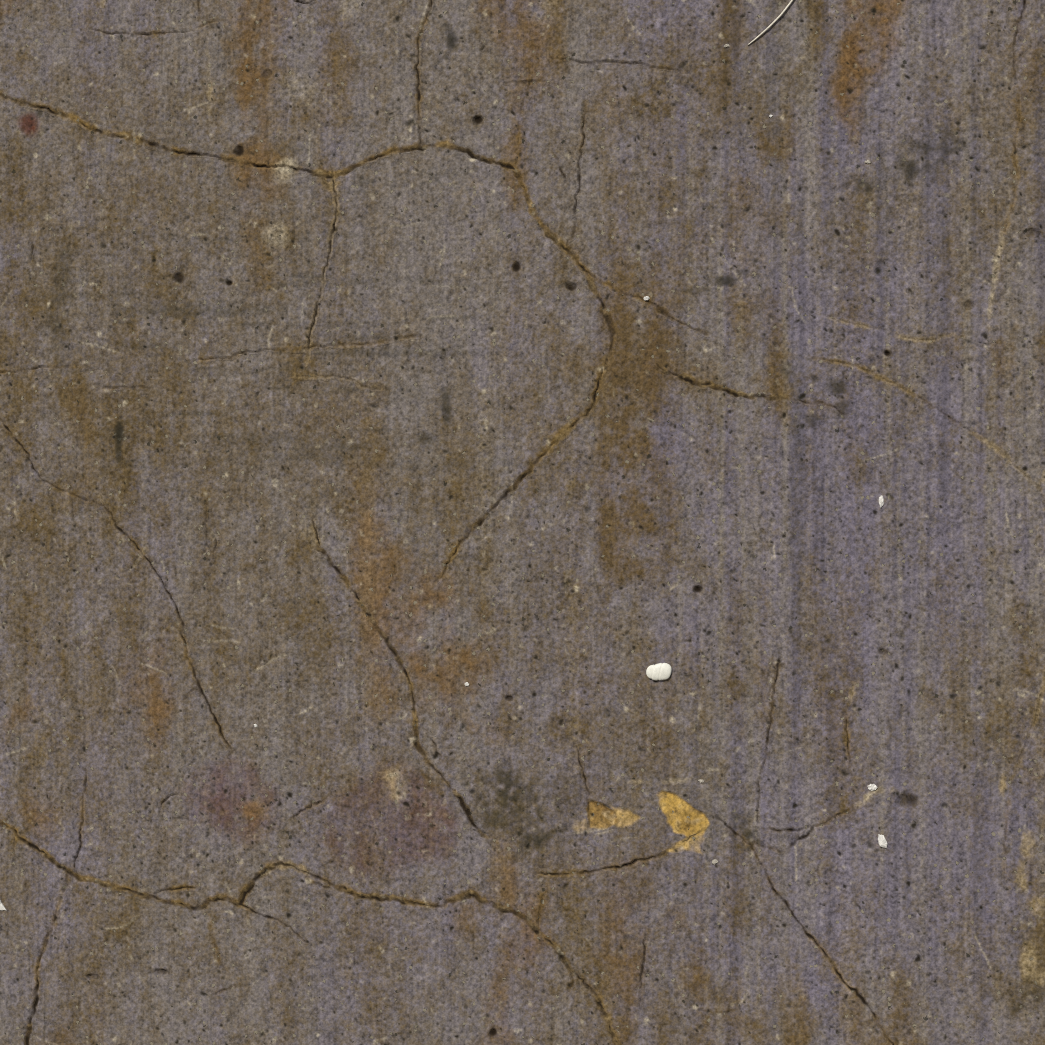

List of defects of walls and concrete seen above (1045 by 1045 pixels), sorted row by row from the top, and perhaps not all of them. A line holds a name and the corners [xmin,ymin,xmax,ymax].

rust [219,0,296,209]
rust [823,0,913,148]
crack [0,0,710,588]
crack [655,361,849,416]
crack [0,415,233,752]
crack [307,509,491,841]
crack [0,649,904,1045]
spalling [571,800,643,836]
spalling [653,790,718,865]